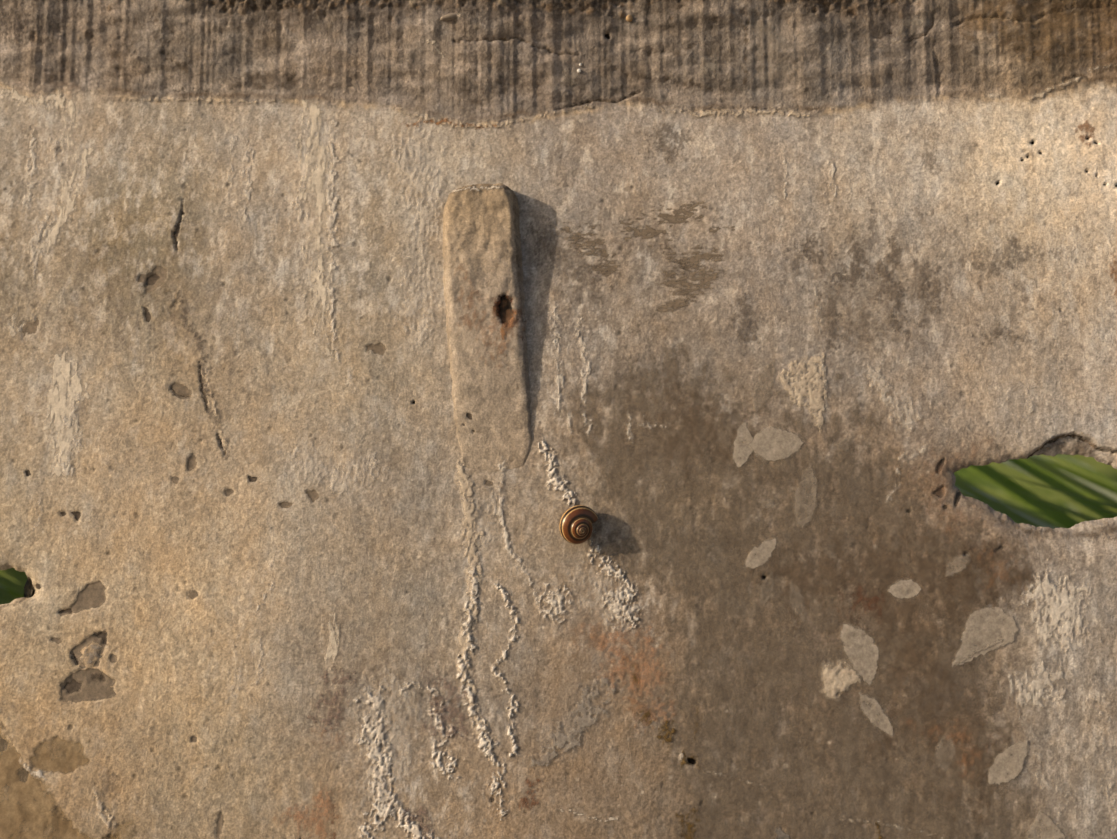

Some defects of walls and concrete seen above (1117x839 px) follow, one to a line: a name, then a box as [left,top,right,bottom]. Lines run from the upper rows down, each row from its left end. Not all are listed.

crack [173,211,185,250]
rust [493,295,519,340]
crack [177,292,229,459]
efflorescence [538,441,577,508]
crack [1027,435,1116,461]
damp [307,457,571,839]
damp [550,306,1066,839]
damp [1007,570,1091,651]
damp [531,676,617,766]
peeling [0,725,129,839]